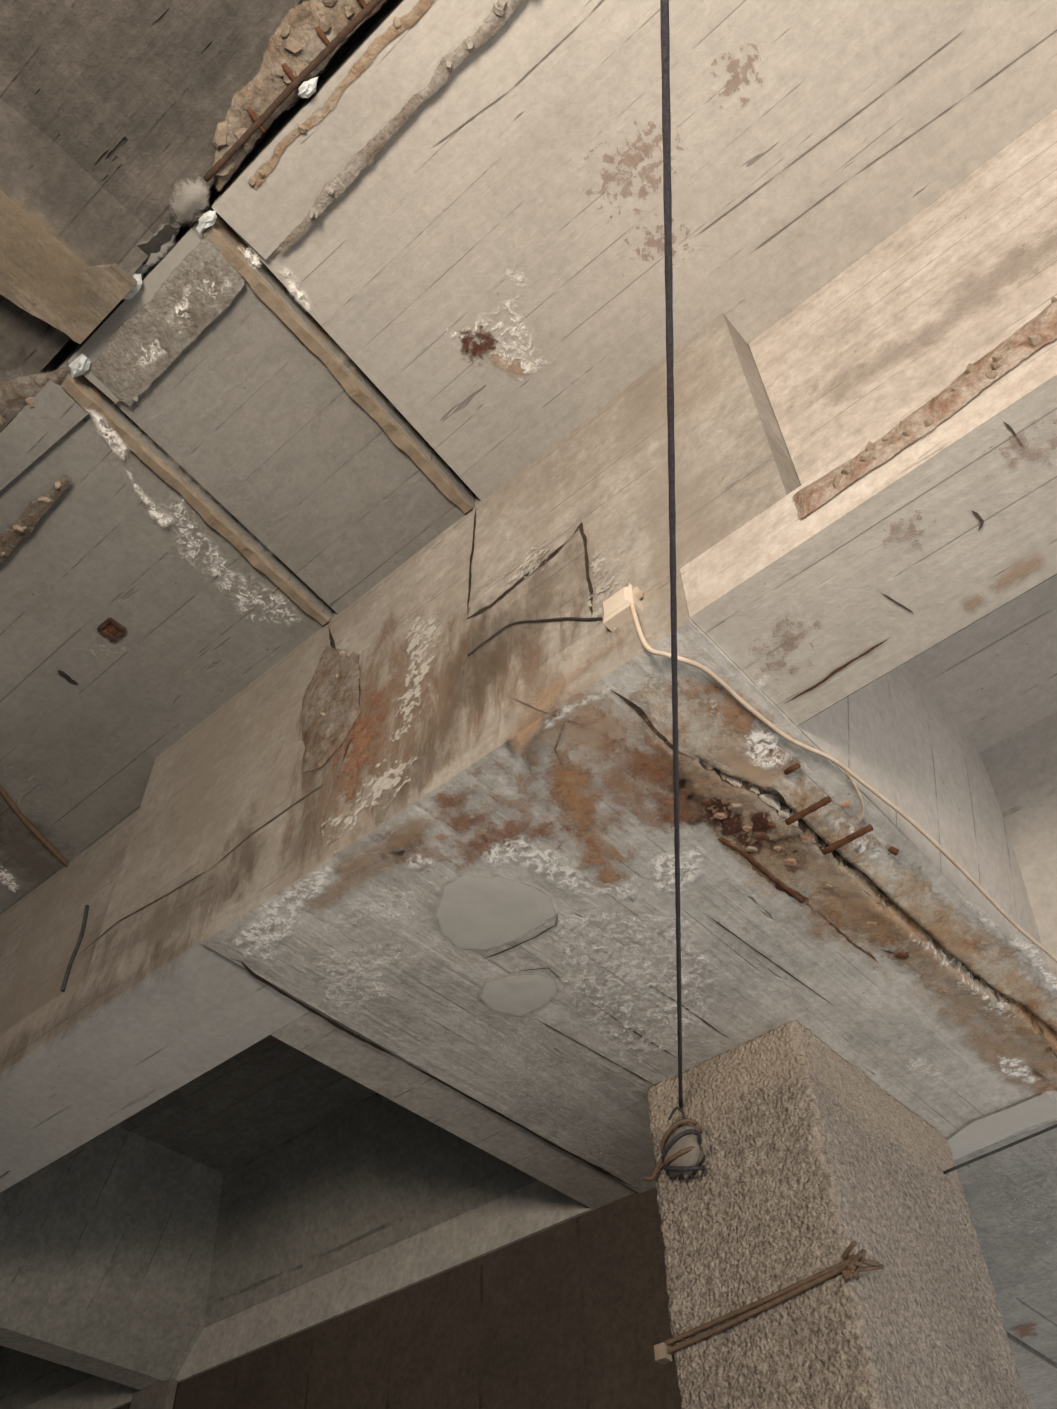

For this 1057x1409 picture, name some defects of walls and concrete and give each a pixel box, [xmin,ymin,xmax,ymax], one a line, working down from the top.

spalling [203,0,434,191]
spalling [276,0,522,252]
spalling [91,235,245,406]
leakage [451,301,542,373]
spalling [793,297,1057,519]
leakage [88,410,297,620]
crack [467,509,593,619]
leakage [0,866,18,893]
leakage [235,756,417,965]
leakage [390,612,443,742]
rust [302,625,809,906]
spalling [630,674,1057,1082]